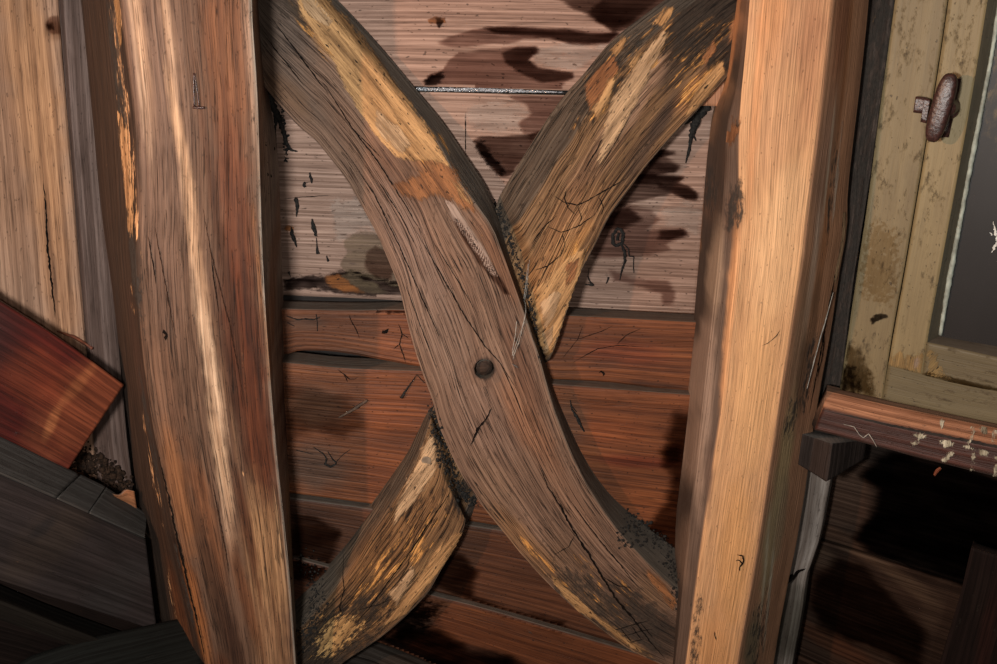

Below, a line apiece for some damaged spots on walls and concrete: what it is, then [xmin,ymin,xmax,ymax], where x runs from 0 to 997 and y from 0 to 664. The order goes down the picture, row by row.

crack [533,109,634,270]
crack [158,454,205,660]
crack [538,465,663,656]